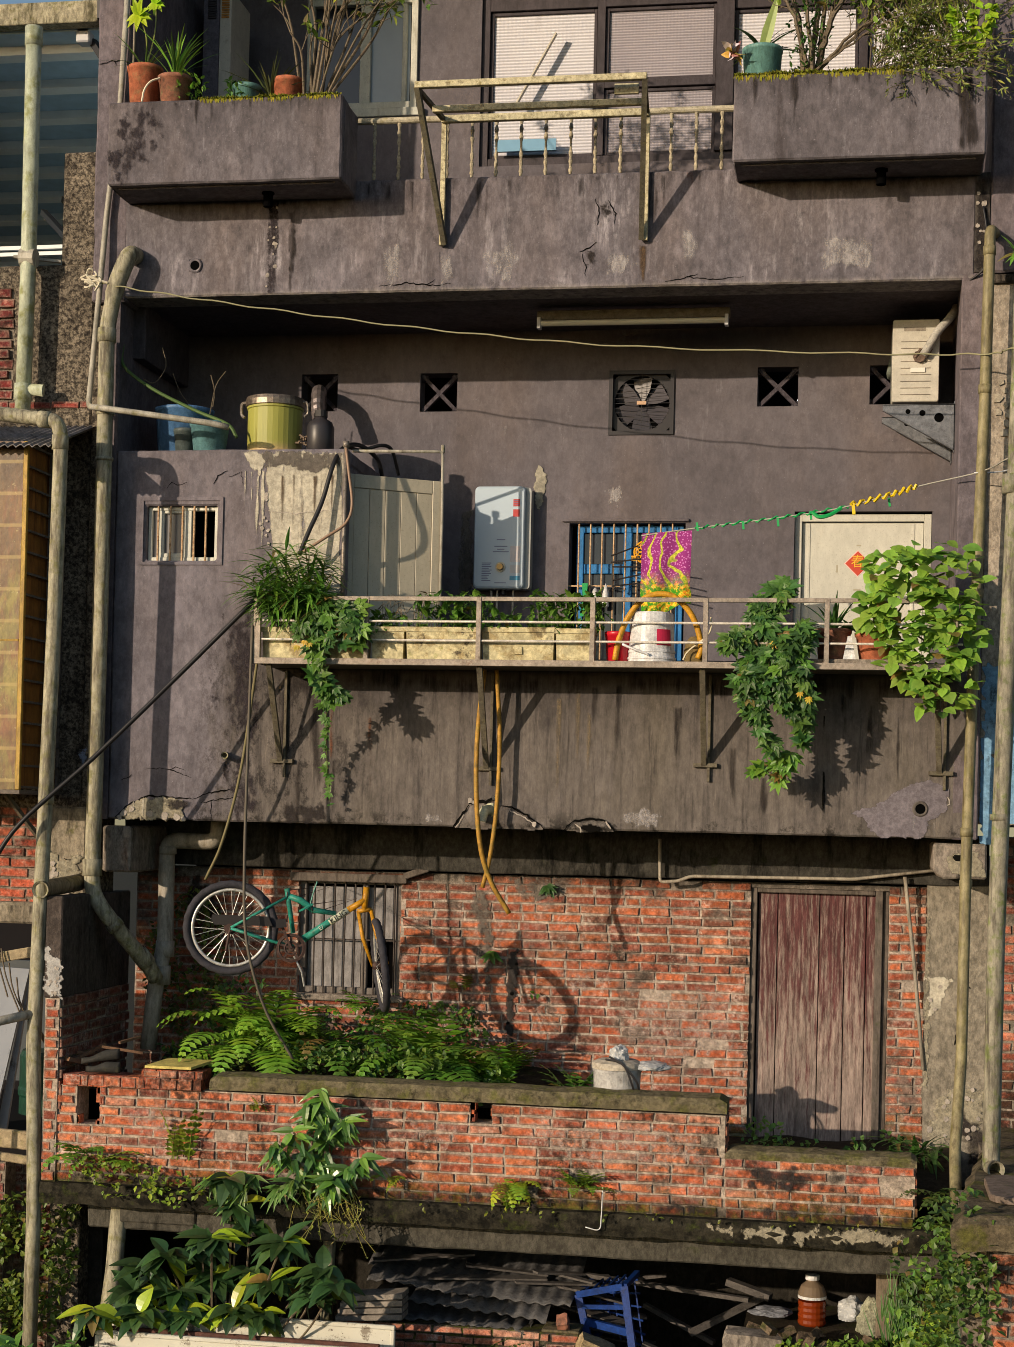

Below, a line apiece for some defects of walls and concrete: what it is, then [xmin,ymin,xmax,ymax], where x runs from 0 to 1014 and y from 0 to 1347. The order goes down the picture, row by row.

leakage [107,110,163,184]
leakage [265,200,296,293]
peeling [244,450,344,596]
leakage [280,672,334,824]
spalling [115,788,240,821]
peeling [851,780,950,839]
peeling [43,946,64,999]